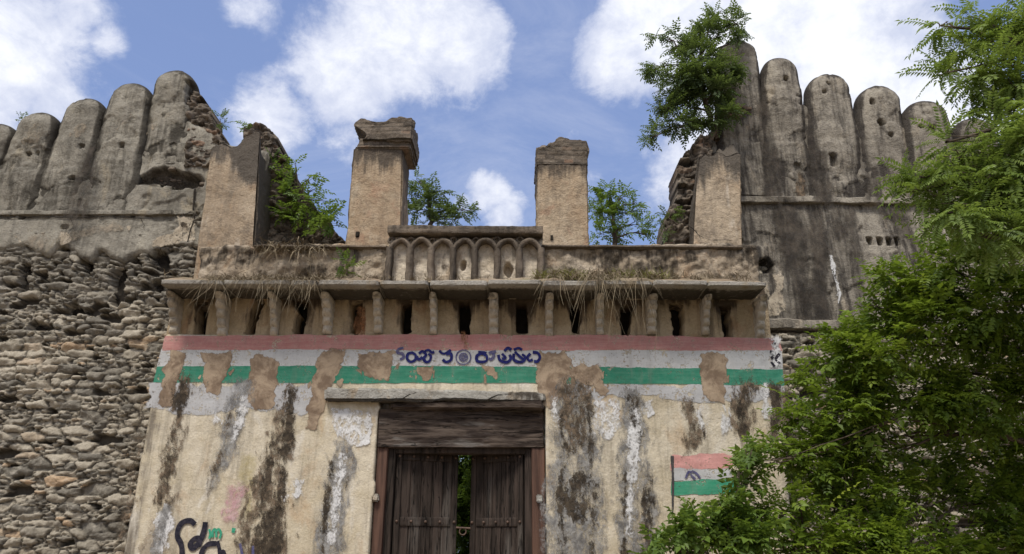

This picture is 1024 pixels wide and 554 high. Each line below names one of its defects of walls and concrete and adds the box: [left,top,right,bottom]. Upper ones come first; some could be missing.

damp [118,371,201,554]
peeling [158,350,186,407]
peeling [198,350,234,396]
peeling [247,354,280,410]
damp [234,383,299,554]
peeling [305,348,345,430]
damp [313,441,359,554]
peeling [536,350,609,409]
damp [540,376,660,554]
damp [680,396,708,454]
peeling [699,352,729,404]
damp [721,336,790,445]